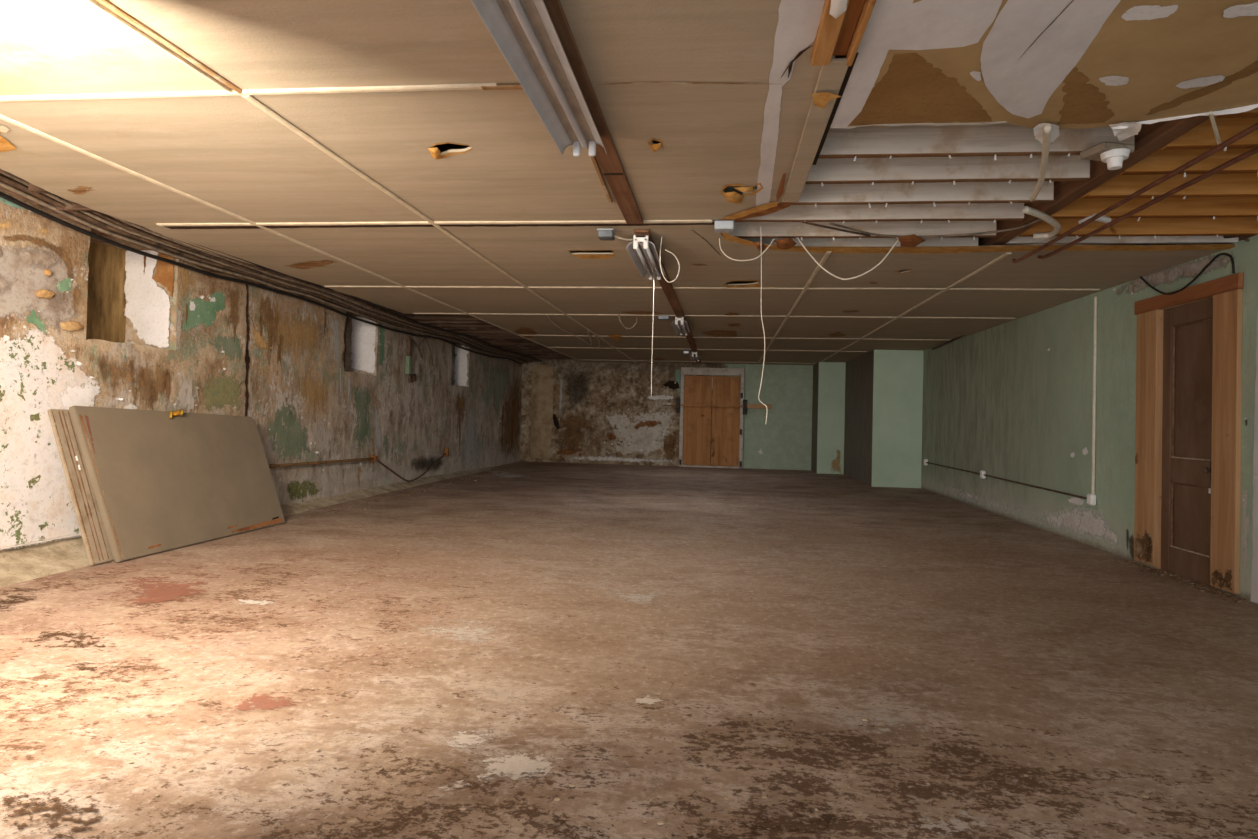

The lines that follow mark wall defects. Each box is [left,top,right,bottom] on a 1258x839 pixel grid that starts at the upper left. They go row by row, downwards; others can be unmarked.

peeling [0,246,101,551]
leakage [76,348,171,411]
peeling [123,250,273,413]
leakage [225,289,242,341]
leakage [255,299,350,423]
spalling [604,370,680,459]